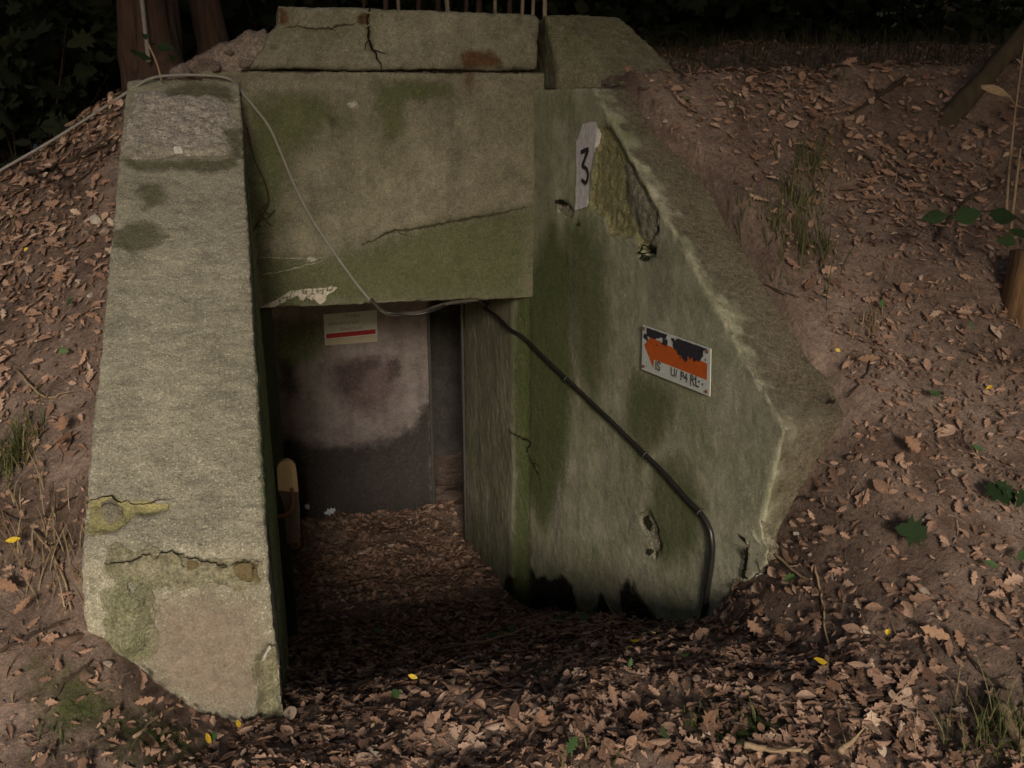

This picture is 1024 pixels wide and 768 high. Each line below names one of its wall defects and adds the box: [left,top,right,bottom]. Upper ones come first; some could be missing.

crack [241,8,537,74]
spalling [589,125,659,261]
crack [364,207,524,244]
peeling [261,286,337,308]
crack [508,429,540,481]
spalling [84,495,263,594]
crack [105,550,261,567]
peeling [640,508,662,557]
damp [503,569,577,614]
damp [596,581,664,624]